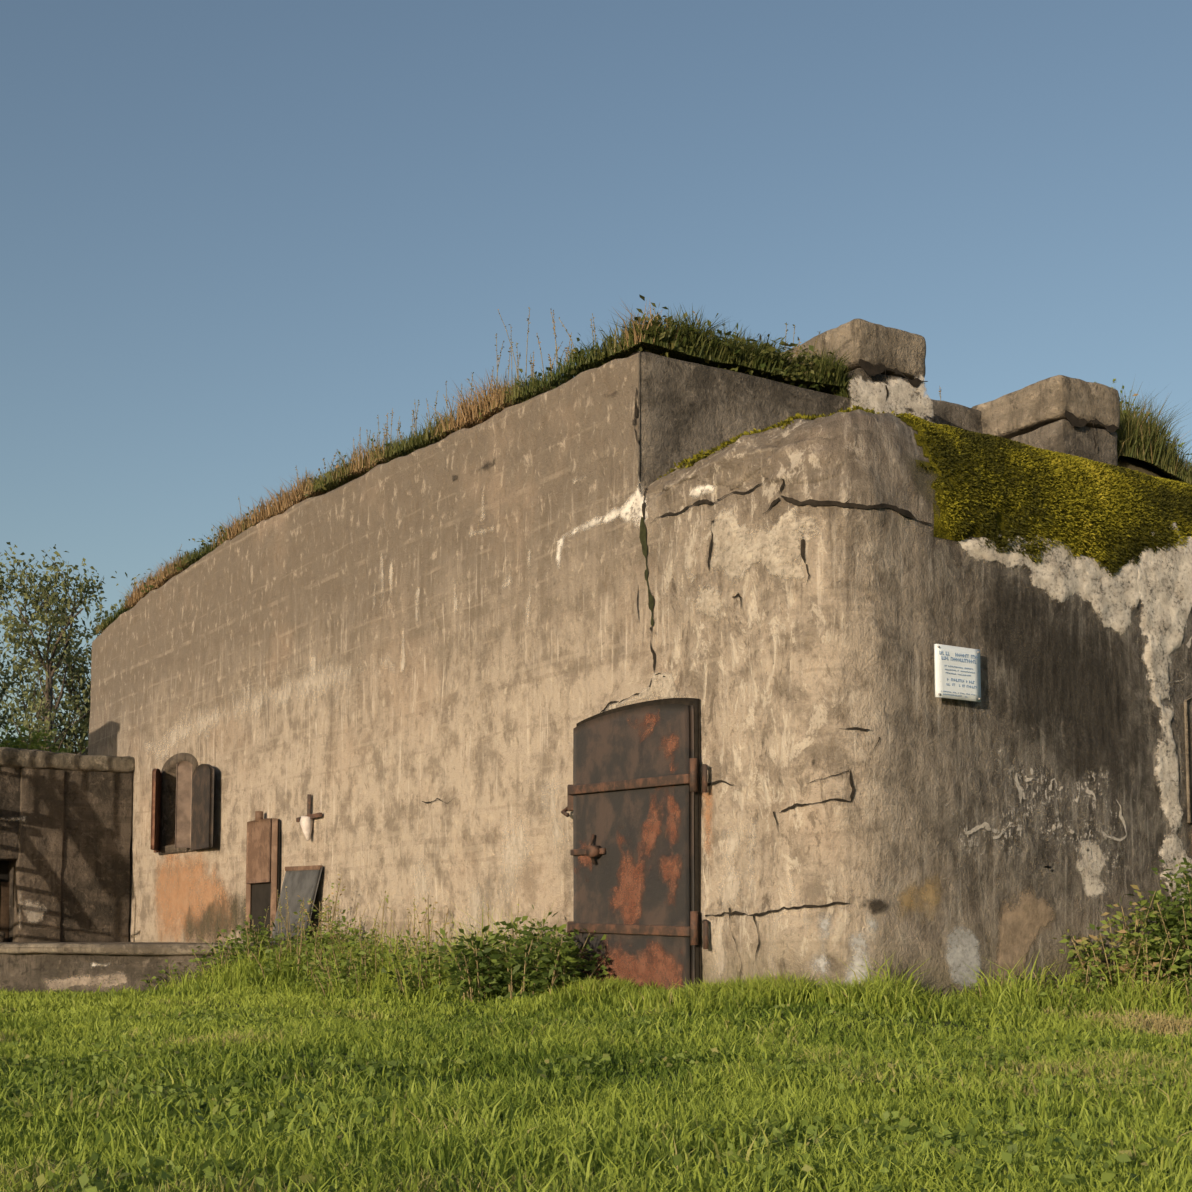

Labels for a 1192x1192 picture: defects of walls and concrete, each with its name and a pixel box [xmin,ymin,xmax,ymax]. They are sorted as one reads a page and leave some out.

flaking render [849,374,933,421]
water stain [556,488,648,563]
crack [600,478,931,713]
crack [839,727,880,747]
flaking render [959,522,1192,903]
crack [773,769,855,830]
rust [610,796,680,925]
rust [581,944,682,990]
crack [705,902,851,981]